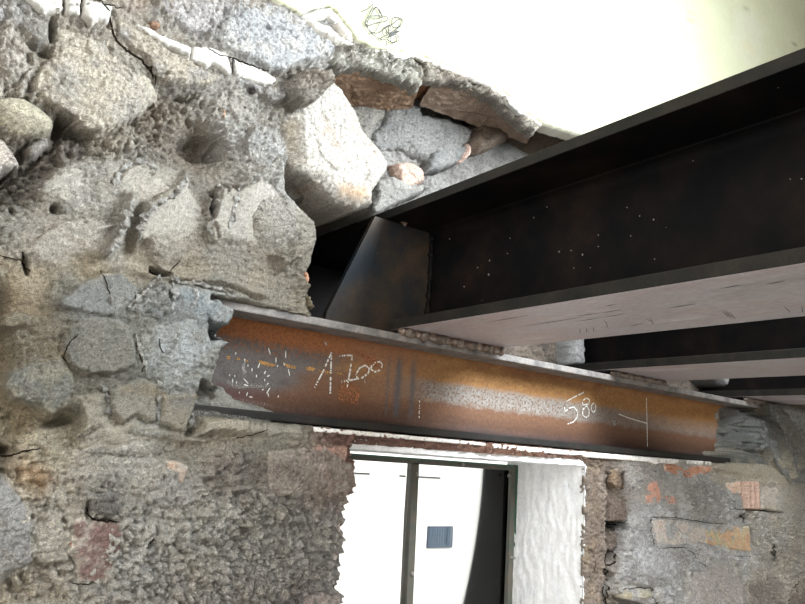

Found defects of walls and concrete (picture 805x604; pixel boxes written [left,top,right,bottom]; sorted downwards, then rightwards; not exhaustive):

crack [80,0,156,85]
crack [208,48,269,74]
spalling [298,8,542,139]
crack [0,251,30,271]
crack [0,447,40,457]
crack [592,552,658,604]